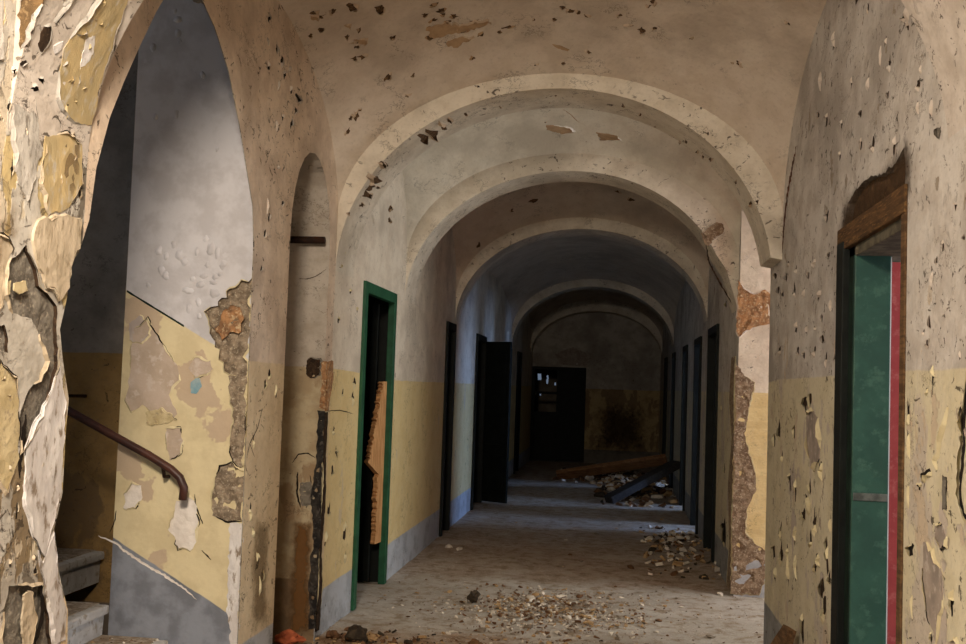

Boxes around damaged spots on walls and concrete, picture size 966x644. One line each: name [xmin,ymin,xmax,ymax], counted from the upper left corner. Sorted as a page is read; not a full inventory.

flaking render [309,3,360,38]
peeling [422,2,515,48]
peeling [267,37,303,132]
peeling [914,65,933,117]
flaking render [417,117,454,145]
peeling [544,121,576,135]
peeling [596,132,621,142]
spalling [123,279,255,644]
crack [932,372,966,524]
spalling [720,356,831,625]
peeling [906,468,932,510]
peeling [905,522,959,644]